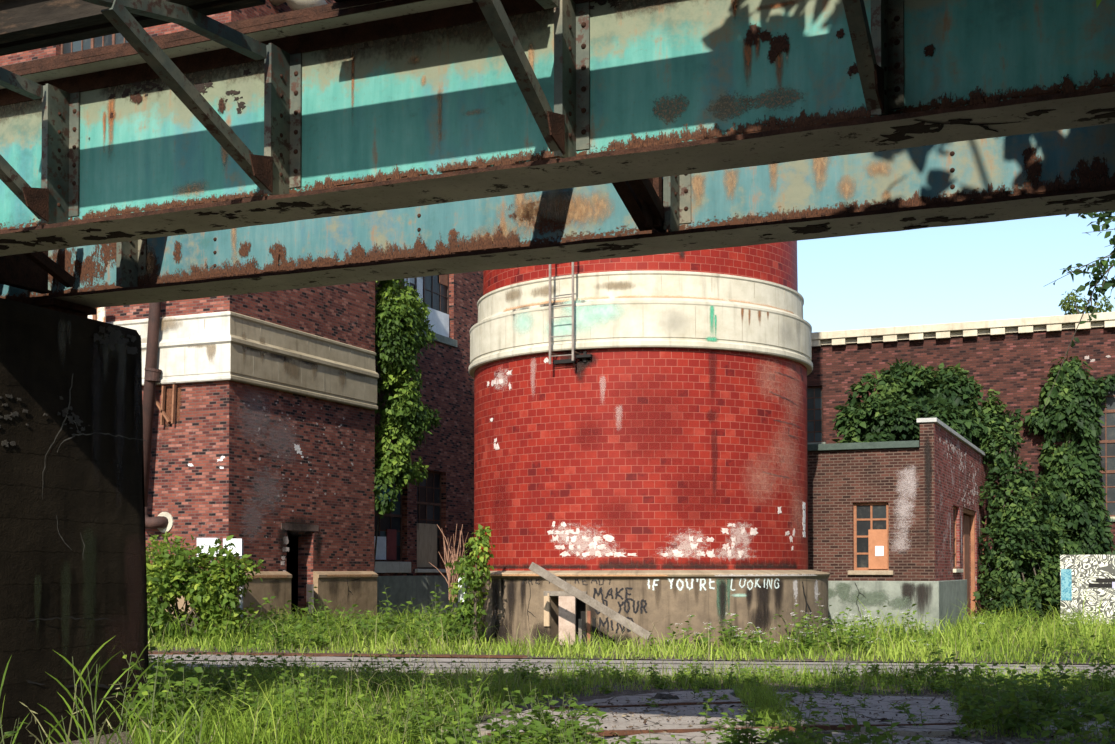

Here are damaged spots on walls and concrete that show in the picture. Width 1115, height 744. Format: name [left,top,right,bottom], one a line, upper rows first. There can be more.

corrosion [607,23,872,150]
corrosion [85,184,265,219]
peeling [194,201,362,219]
corrosion [314,148,555,190]
corrosion [746,147,1115,224]
peeling [78,228,187,240]
corrosion [138,193,607,285]
crack [42,375,146,552]
peeling [547,521,637,557]
peeling [661,523,758,559]
water stain [481,562,818,632]
water stain [902,583,931,611]